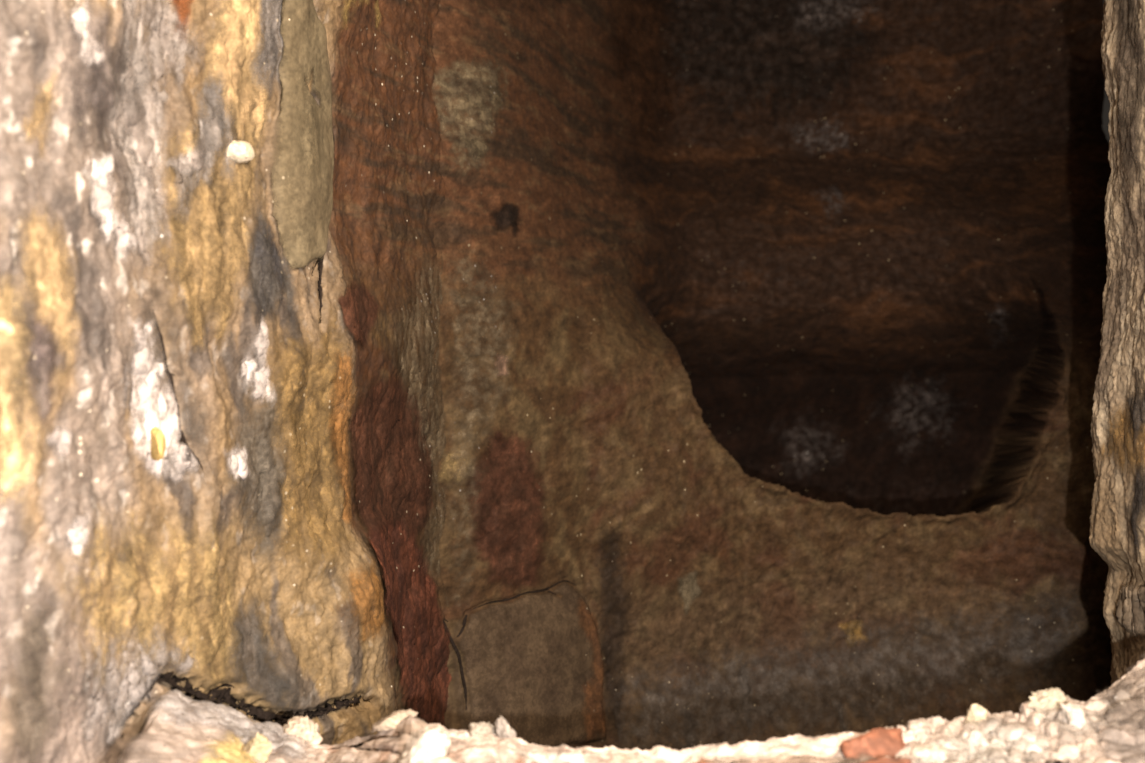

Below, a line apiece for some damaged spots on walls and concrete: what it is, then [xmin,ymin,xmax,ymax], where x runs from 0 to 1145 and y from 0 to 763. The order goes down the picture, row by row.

crack [153,310,205,474]
water stain [1102,377,1145,553]
crack [117,671,361,727]
crack [332,736,400,752]